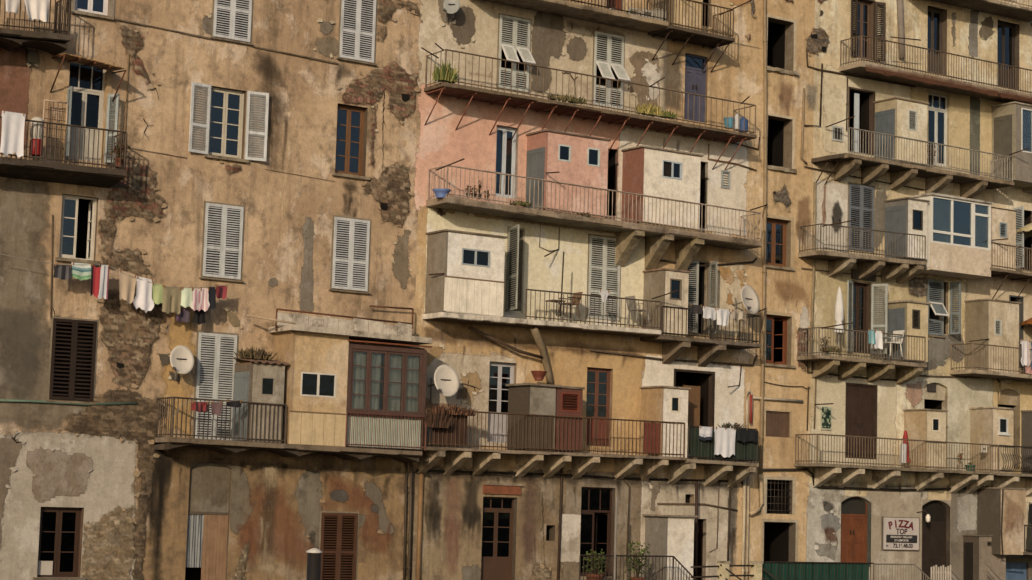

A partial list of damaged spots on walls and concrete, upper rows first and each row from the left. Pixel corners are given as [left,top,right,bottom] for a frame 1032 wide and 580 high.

spalling [120,25,160,90]
spalling [806,0,830,56]
spalling [98,148,167,278]
spalling [338,61,421,290]
spalling [773,184,791,212]
peeling [905,317,965,408]
spalling [60,290,181,580]
peeling [0,438,93,543]
leakage [261,467,277,573]